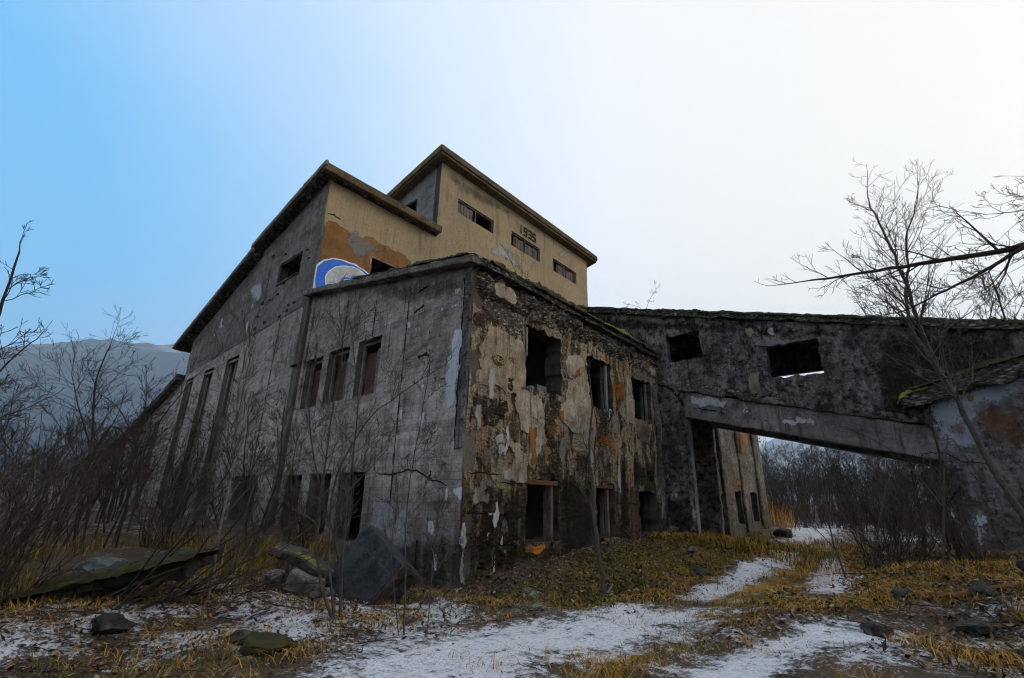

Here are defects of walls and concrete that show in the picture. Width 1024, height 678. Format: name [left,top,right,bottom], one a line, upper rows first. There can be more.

flaking render [306,221,411,274]
flaking render [469,282,635,483]
flaking render [931,378,1024,453]
flaking render [470,474,494,505]